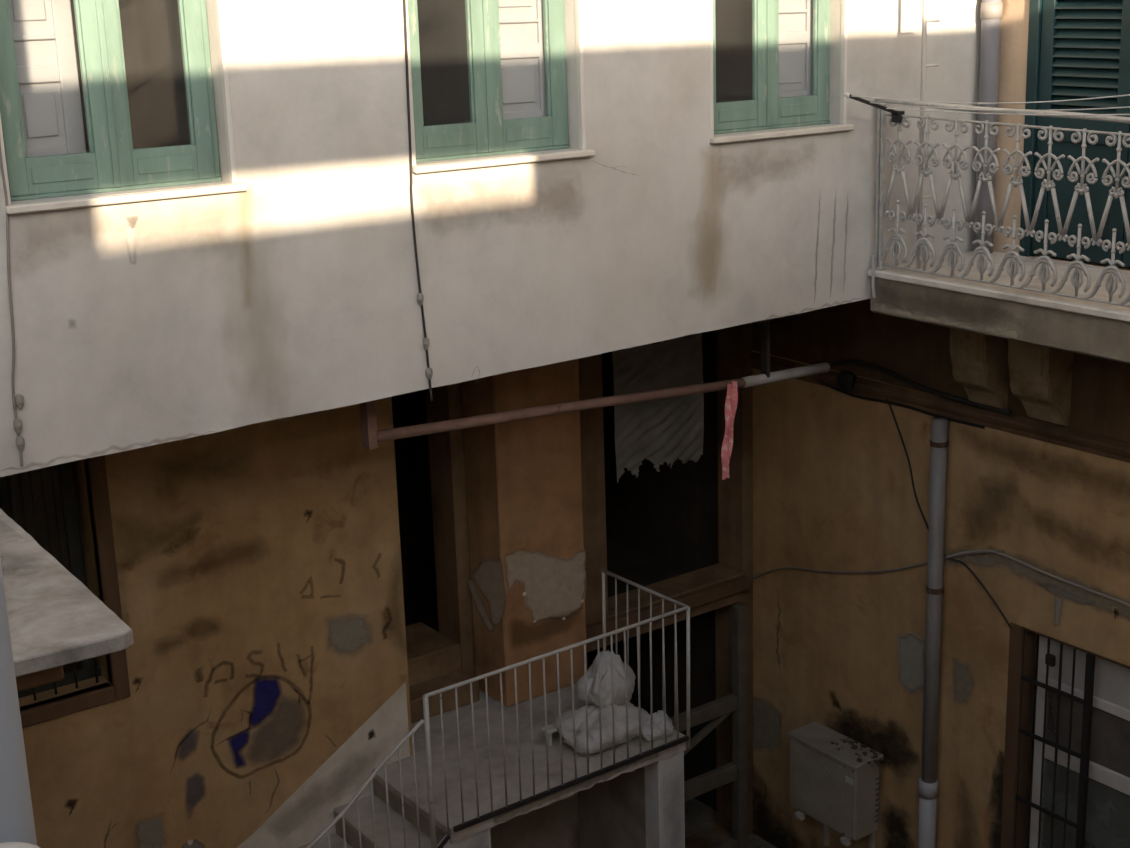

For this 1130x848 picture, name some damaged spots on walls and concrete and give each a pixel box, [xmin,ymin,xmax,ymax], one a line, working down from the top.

peeling [467,550,586,631]
water stain [830,693,917,771]
water stain [884,807,910,848]